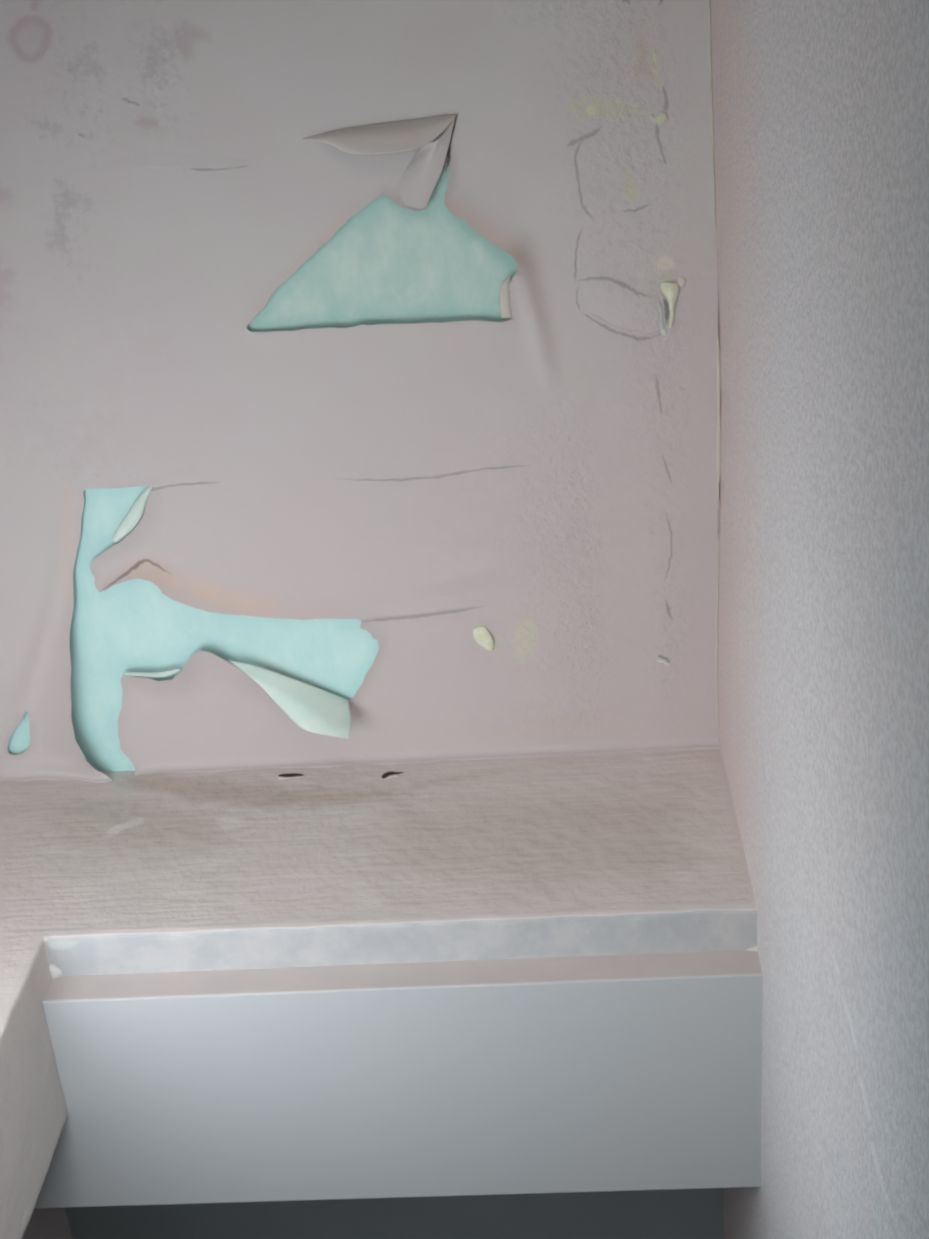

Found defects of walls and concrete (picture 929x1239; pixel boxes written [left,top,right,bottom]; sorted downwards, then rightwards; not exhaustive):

peeling [234,114,543,350]
crack [567,124,650,281]
crack [654,86,670,165]
crack [654,373,662,415]
crack [661,454,673,621]
peeling [35,479,391,783]